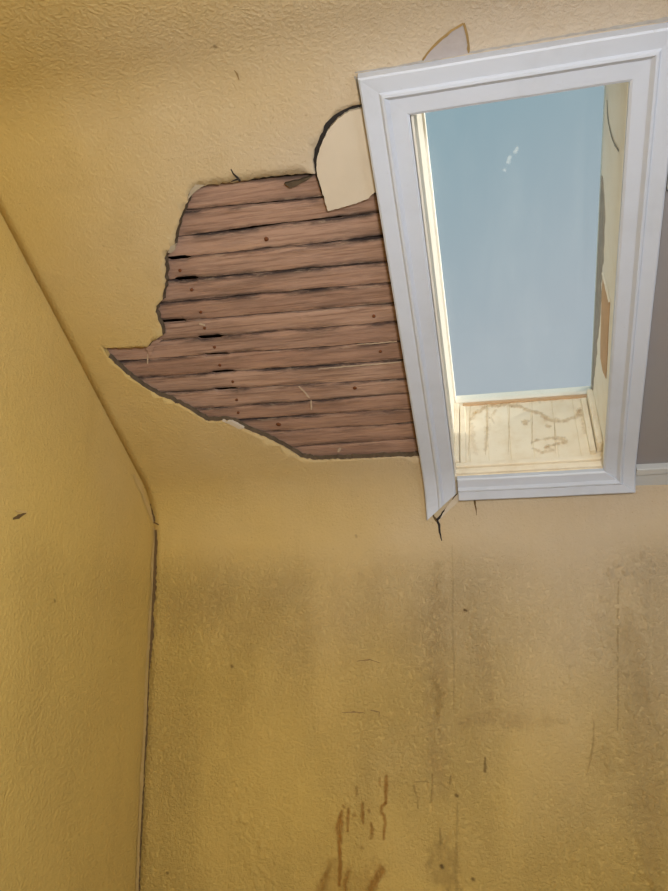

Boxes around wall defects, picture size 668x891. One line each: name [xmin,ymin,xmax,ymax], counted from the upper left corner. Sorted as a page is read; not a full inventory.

crack [313,17,668,197]
spalling [284,174,313,188]
spalling [145,184,204,356]
spalling [109,354,419,460]
crack [432,493,477,541]